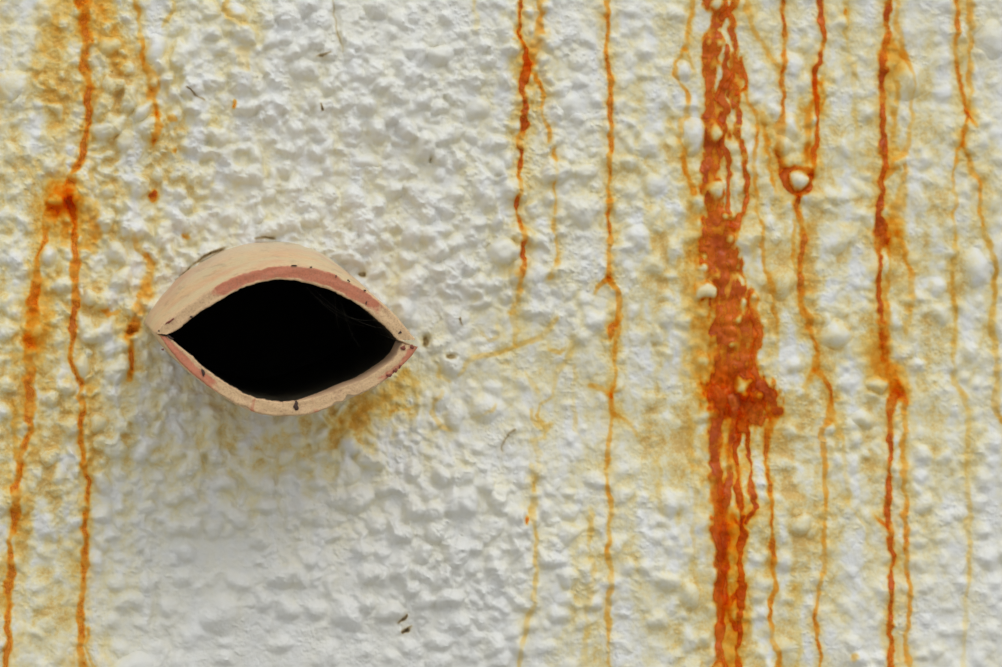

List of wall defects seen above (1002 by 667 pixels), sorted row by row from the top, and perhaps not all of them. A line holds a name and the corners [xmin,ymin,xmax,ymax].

rust [817,0,826,37]
rust [79,89,91,166]
rust [519,39,531,130]
rust [811,53,822,157]
rust [879,56,889,89]
rust [780,167,813,210]
rust [875,105,889,244]
rust [699,0,783,667]
rust [887,538,896,667]